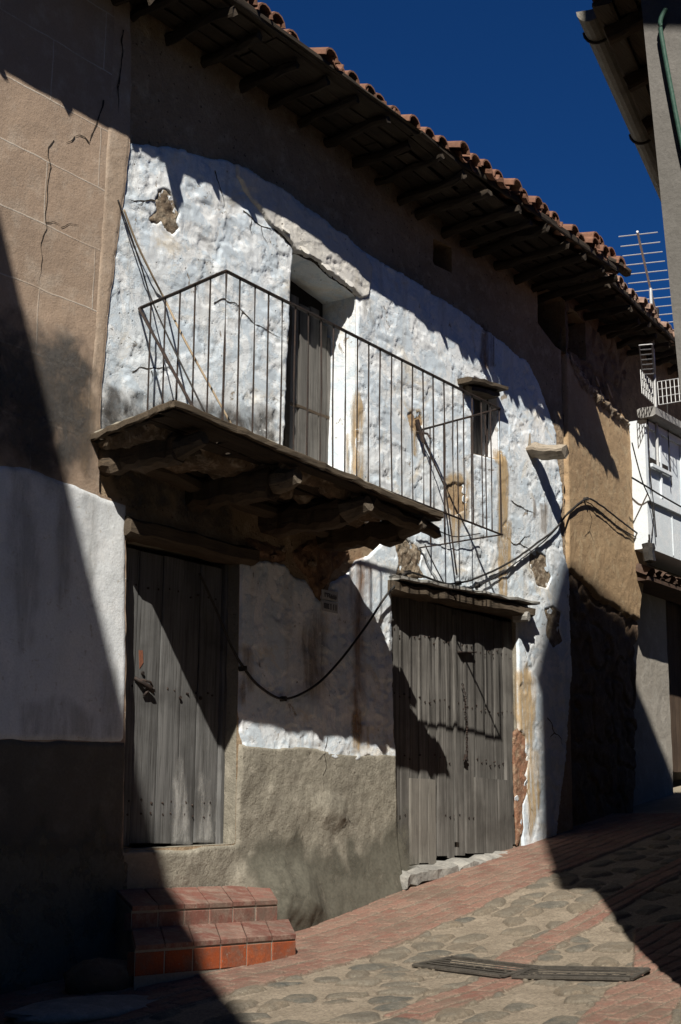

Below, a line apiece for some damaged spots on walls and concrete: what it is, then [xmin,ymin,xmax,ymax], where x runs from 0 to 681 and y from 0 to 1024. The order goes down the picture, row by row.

crack [39,30,124,278]
spalling [149,189,179,234]
spalling [395,540,424,579]
spalling [529,551,551,588]
spalling [544,606,562,648]
water stain [515,667,540,831]
spalling [512,728,529,846]